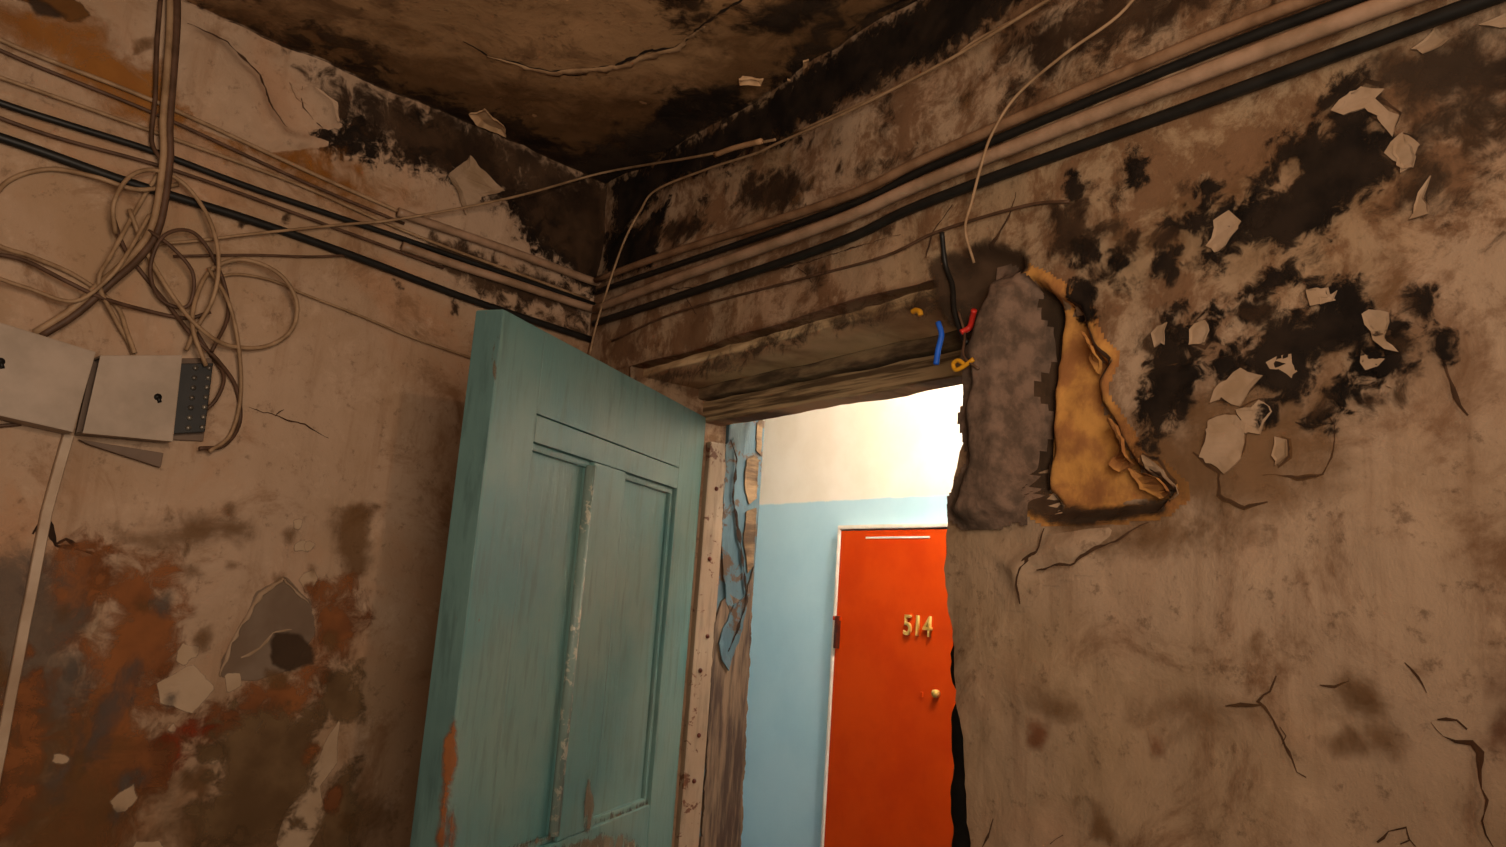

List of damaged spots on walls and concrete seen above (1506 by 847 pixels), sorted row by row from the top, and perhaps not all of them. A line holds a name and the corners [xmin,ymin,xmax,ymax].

leakage [0,9,186,127]
leakage [189,0,1234,335]
spalling [929,241,1190,530]
peeling [1205,210,1241,253]
peeling [1193,354,1337,510]
leakage [1047,26,1506,502]
peeling [1356,309,1398,370]
peeling [1331,78,1431,220]
peeling [0,535,373,847]
crack [1225,676,1306,778]
crack [1320,680,1348,688]
crack [1404,662,1493,847]